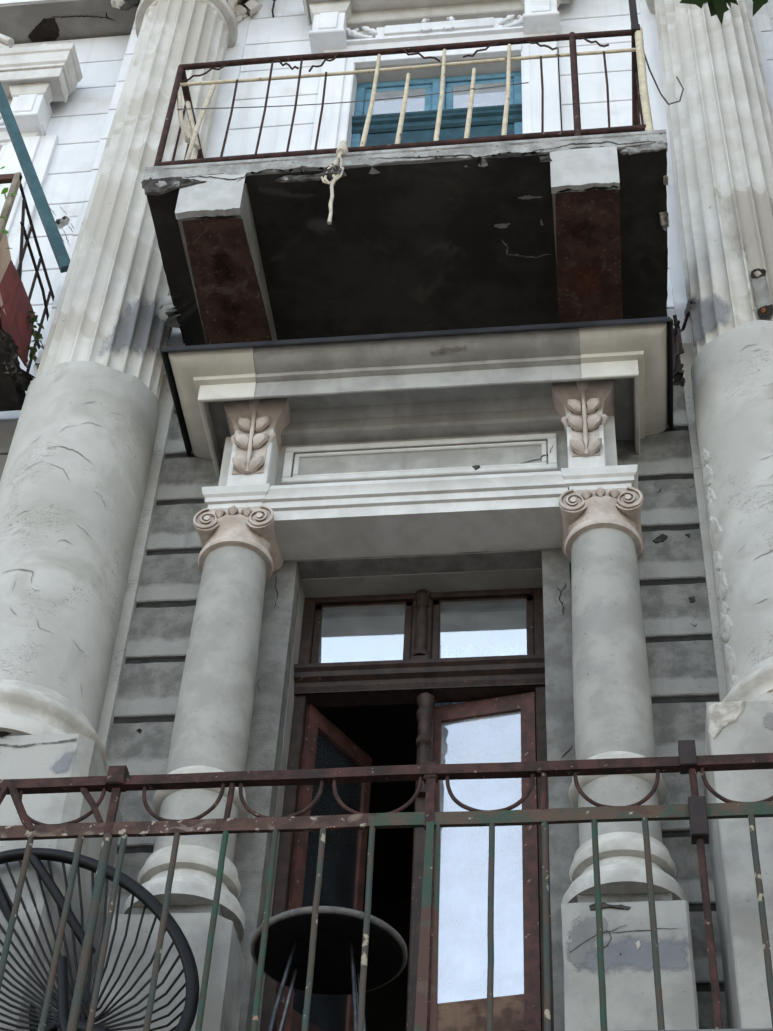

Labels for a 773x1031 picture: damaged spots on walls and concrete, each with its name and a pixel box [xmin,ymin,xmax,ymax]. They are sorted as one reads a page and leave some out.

spalling [28,18,59,43]
crack [568,925,676,954]